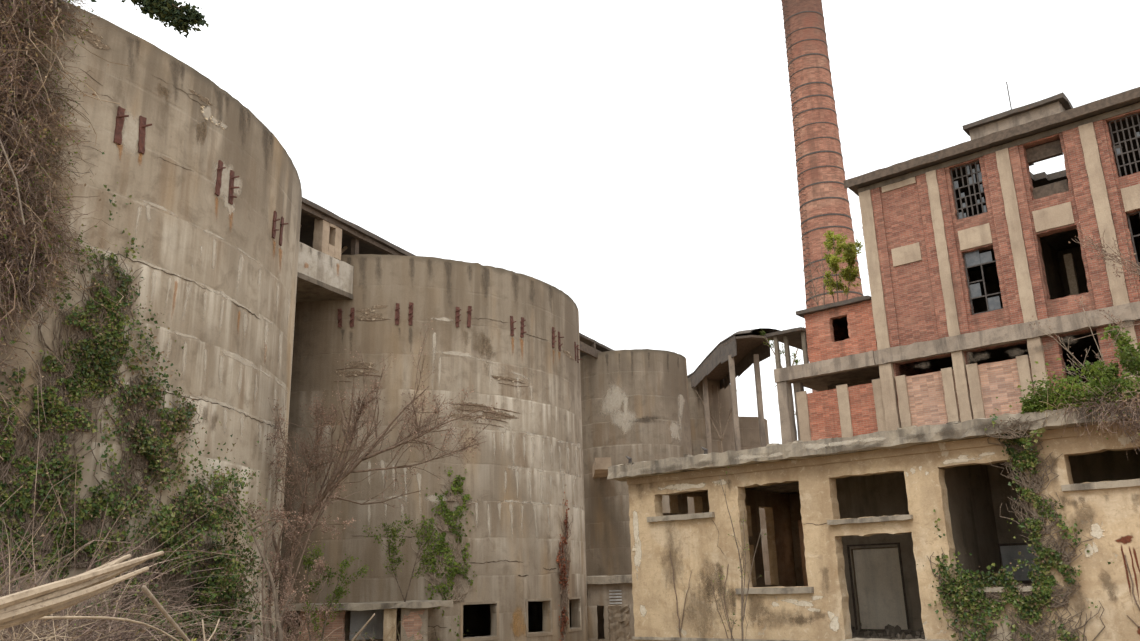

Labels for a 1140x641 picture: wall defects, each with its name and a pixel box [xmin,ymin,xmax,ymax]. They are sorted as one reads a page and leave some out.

spalling [189,89,226,129]
crack [104,250,261,320]
corrosion [1116,535,1140,598]